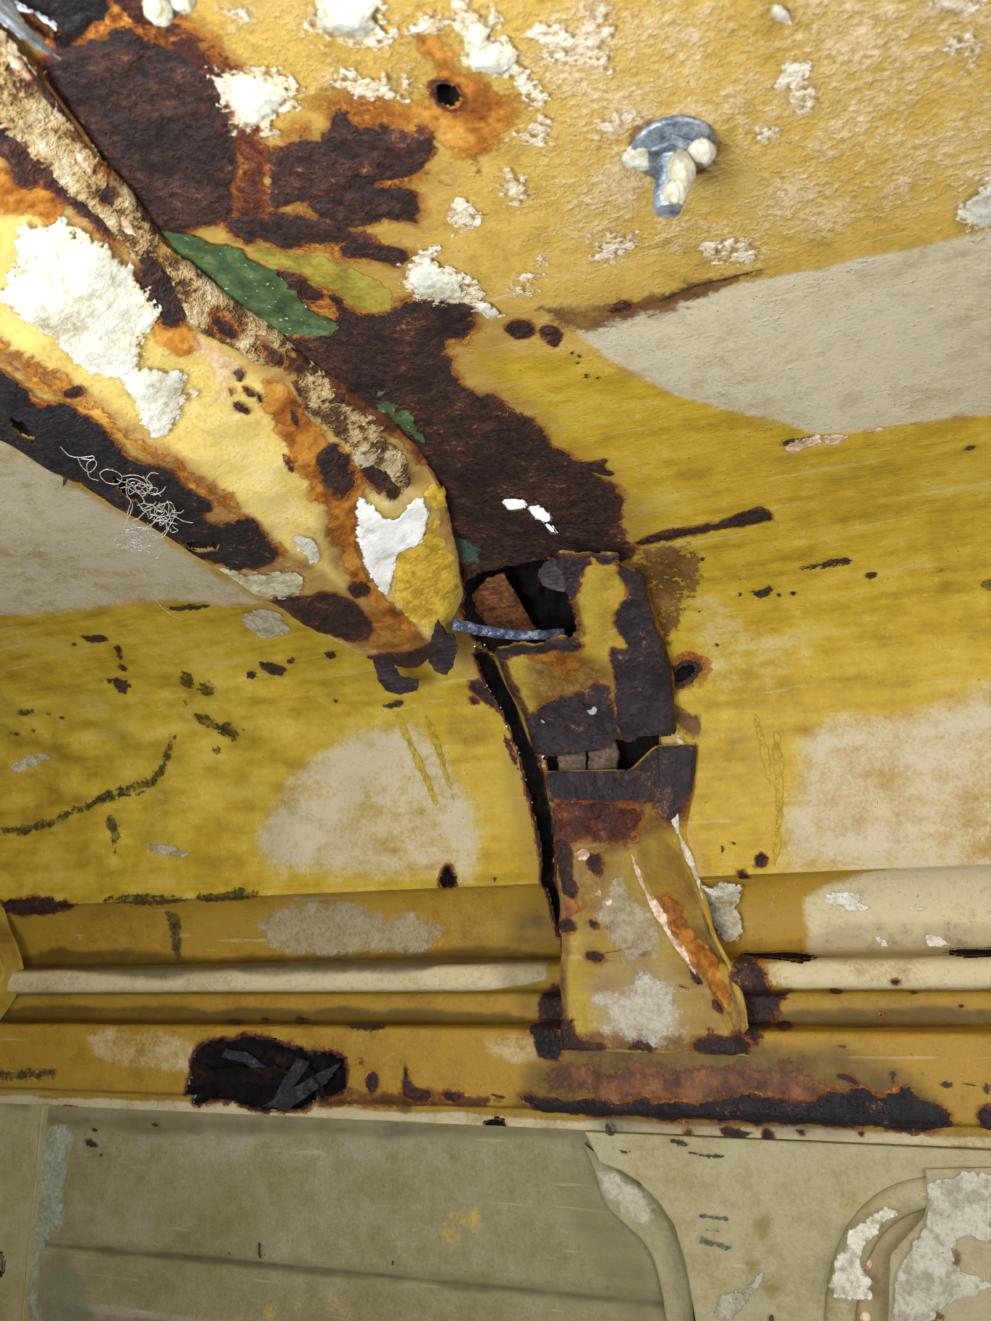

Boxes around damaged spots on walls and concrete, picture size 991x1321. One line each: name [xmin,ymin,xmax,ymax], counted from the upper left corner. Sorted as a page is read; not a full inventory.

peeling [0,30,411,490]
rust [0,0,529,357]
rust [0,341,287,572]
rust [228,270,773,940]
rust [319,894,954,1139]
peeling [596,855,696,974]
peeling [829,1207,897,1301]
peeling [893,1171,991,1321]